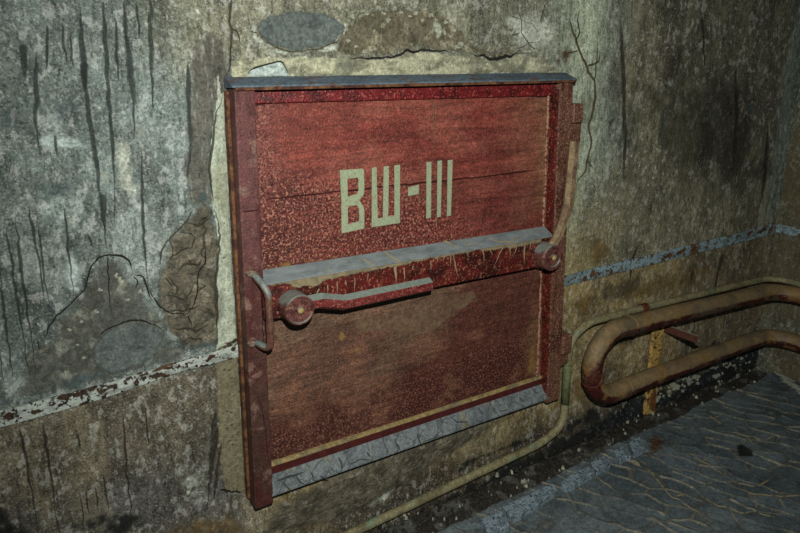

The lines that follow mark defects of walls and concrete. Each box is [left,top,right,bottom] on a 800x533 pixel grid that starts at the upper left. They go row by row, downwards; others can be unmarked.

spalling [248,4,559,76]
crack [566,14,600,186]
crack [37,212,206,349]